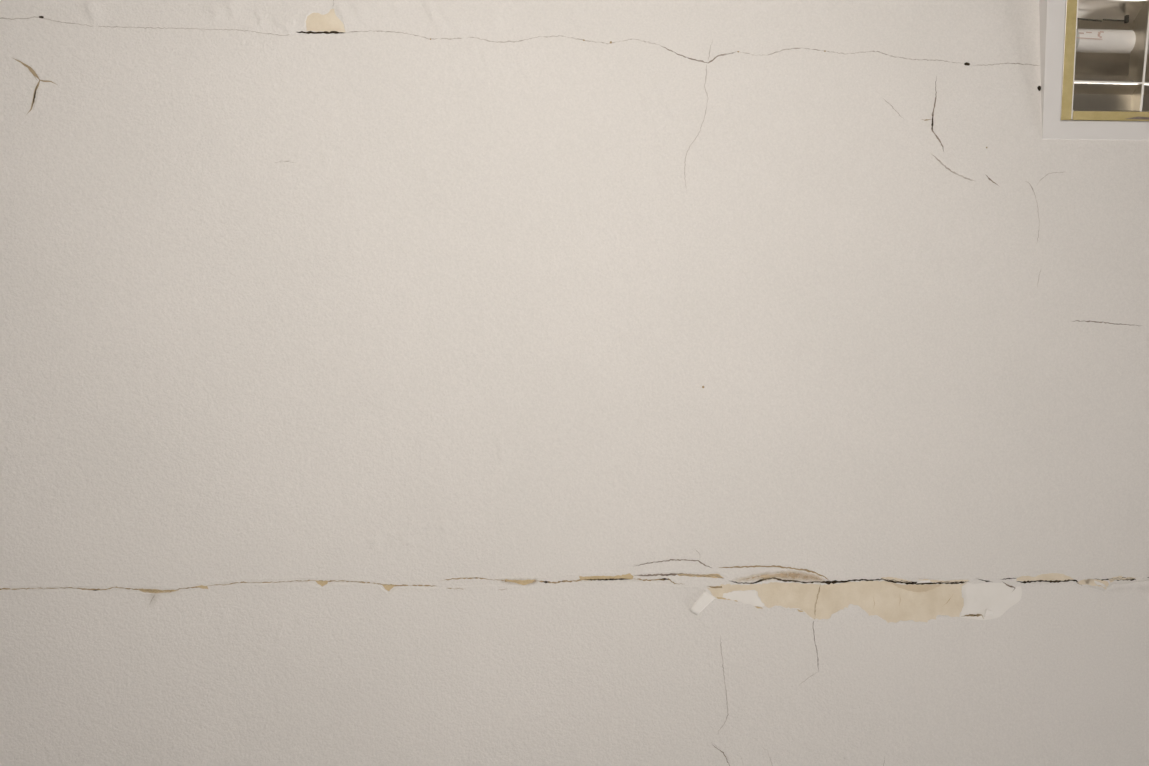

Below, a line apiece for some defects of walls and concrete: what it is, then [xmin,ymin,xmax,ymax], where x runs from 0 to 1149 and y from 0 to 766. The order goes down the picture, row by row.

crack [0,16,1040,186]
crack [0,549,1149,603]
peeling [690,581,1022,630]